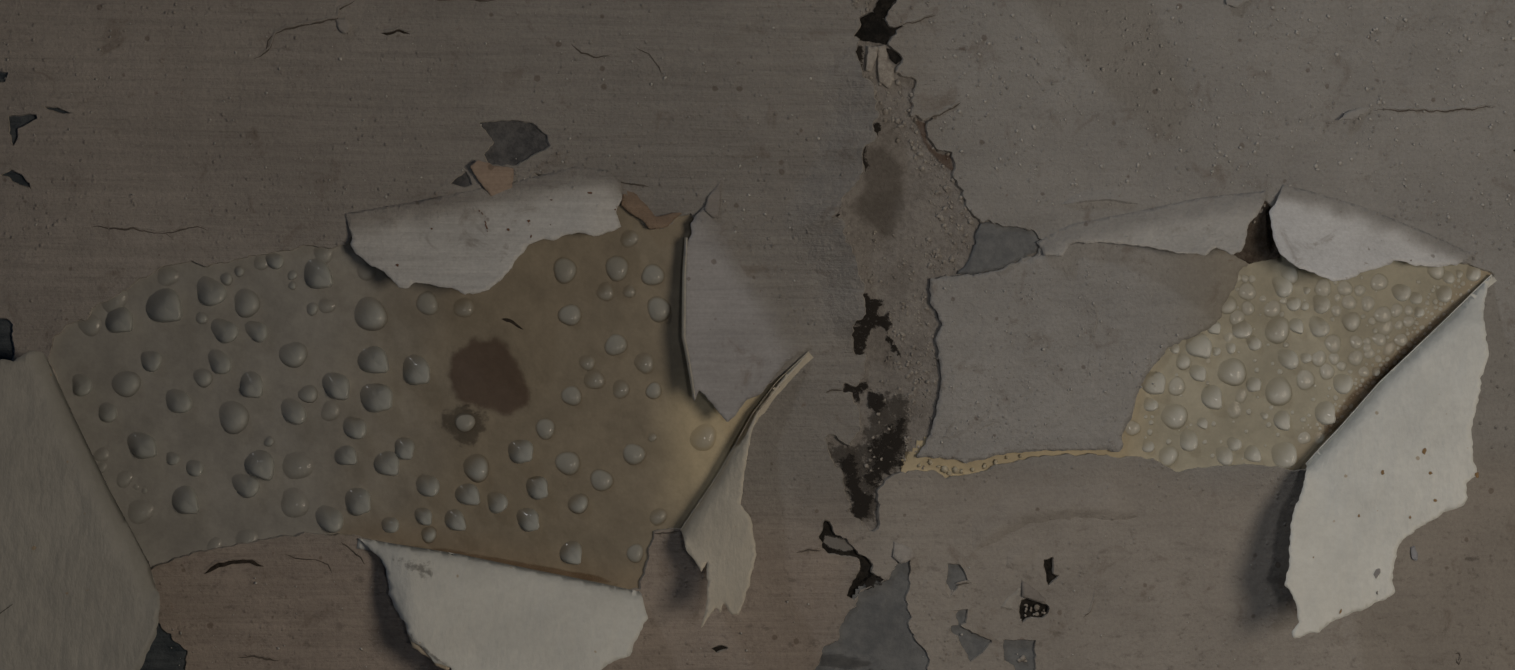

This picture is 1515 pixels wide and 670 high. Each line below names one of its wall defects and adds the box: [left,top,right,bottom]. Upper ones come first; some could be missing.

peeling [3,170,30,187]
peeling [9,108,68,145]
peeling [345,121,622,295]
crack [796,0,1038,598]
peeling [916,185,1475,464]
peeling [0,319,187,670]
peeling [680,204,814,628]
peeling [1284,274,1497,638]
peeling [357,538,648,670]
peeling [815,561,929,670]
peeling [951,610,1035,670]
flaking render [1001,558,1057,621]